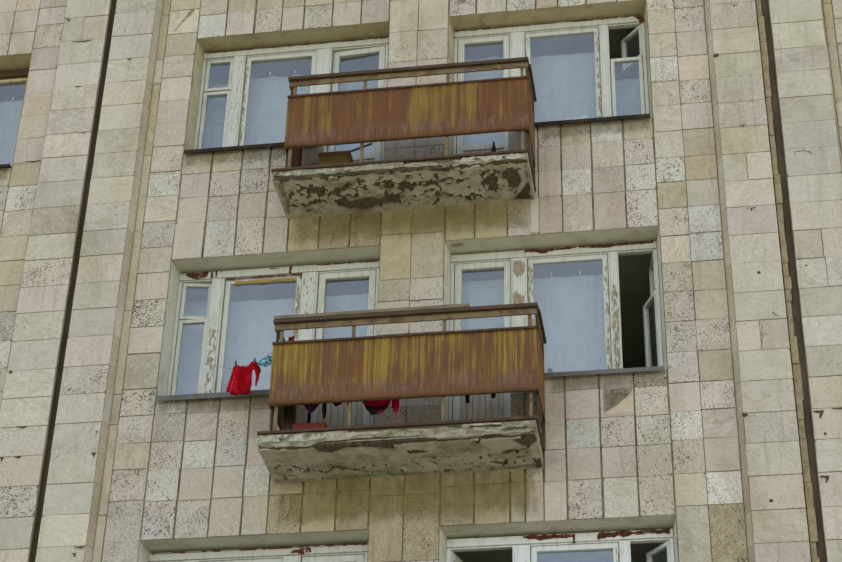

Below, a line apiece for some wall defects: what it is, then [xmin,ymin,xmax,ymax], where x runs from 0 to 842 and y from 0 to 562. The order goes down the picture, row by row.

spalling [274,154,527,211]
peeling [604,266,620,369]
peeling [203,328,218,393]
flaking render [259,422,541,474]
rust [523,534,575,543]
rust [597,529,670,540]